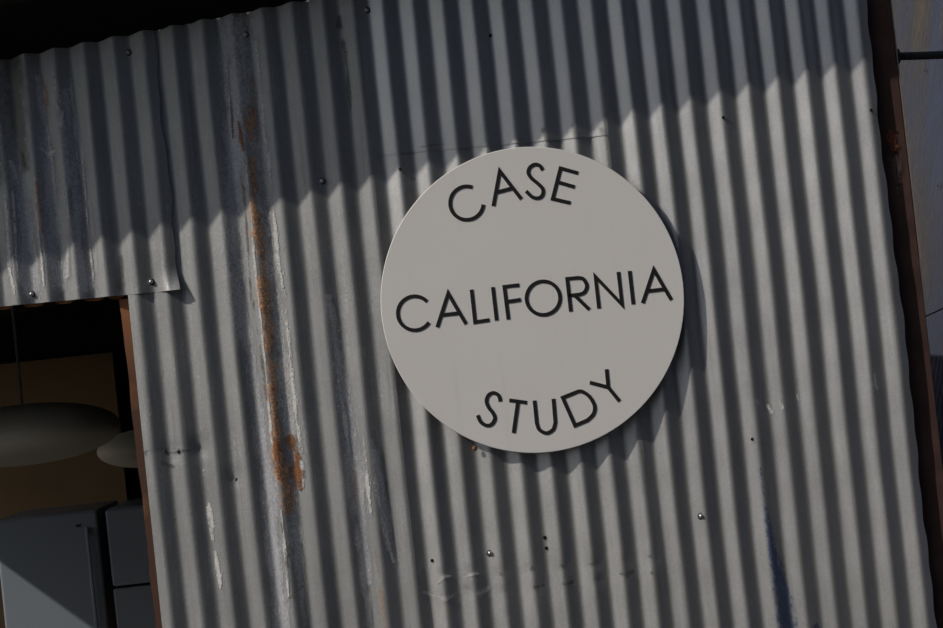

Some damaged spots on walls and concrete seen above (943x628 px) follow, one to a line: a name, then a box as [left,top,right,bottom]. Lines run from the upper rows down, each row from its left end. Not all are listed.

corrosion [237,106,304,516]